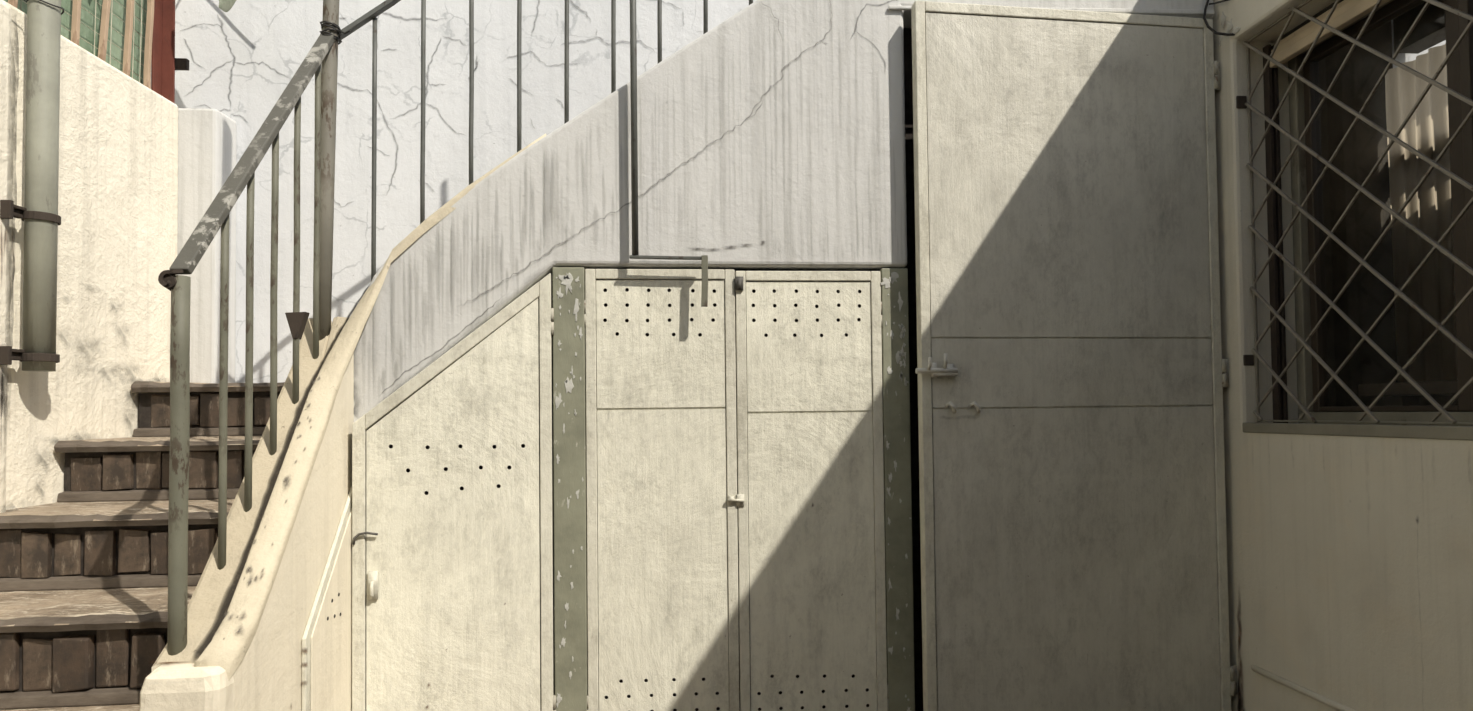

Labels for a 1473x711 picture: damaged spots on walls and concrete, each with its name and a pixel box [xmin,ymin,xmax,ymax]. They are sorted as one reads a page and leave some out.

peeling [555,273,583,434]
peeling [880,272,908,396]
peeling [557,546,583,680]